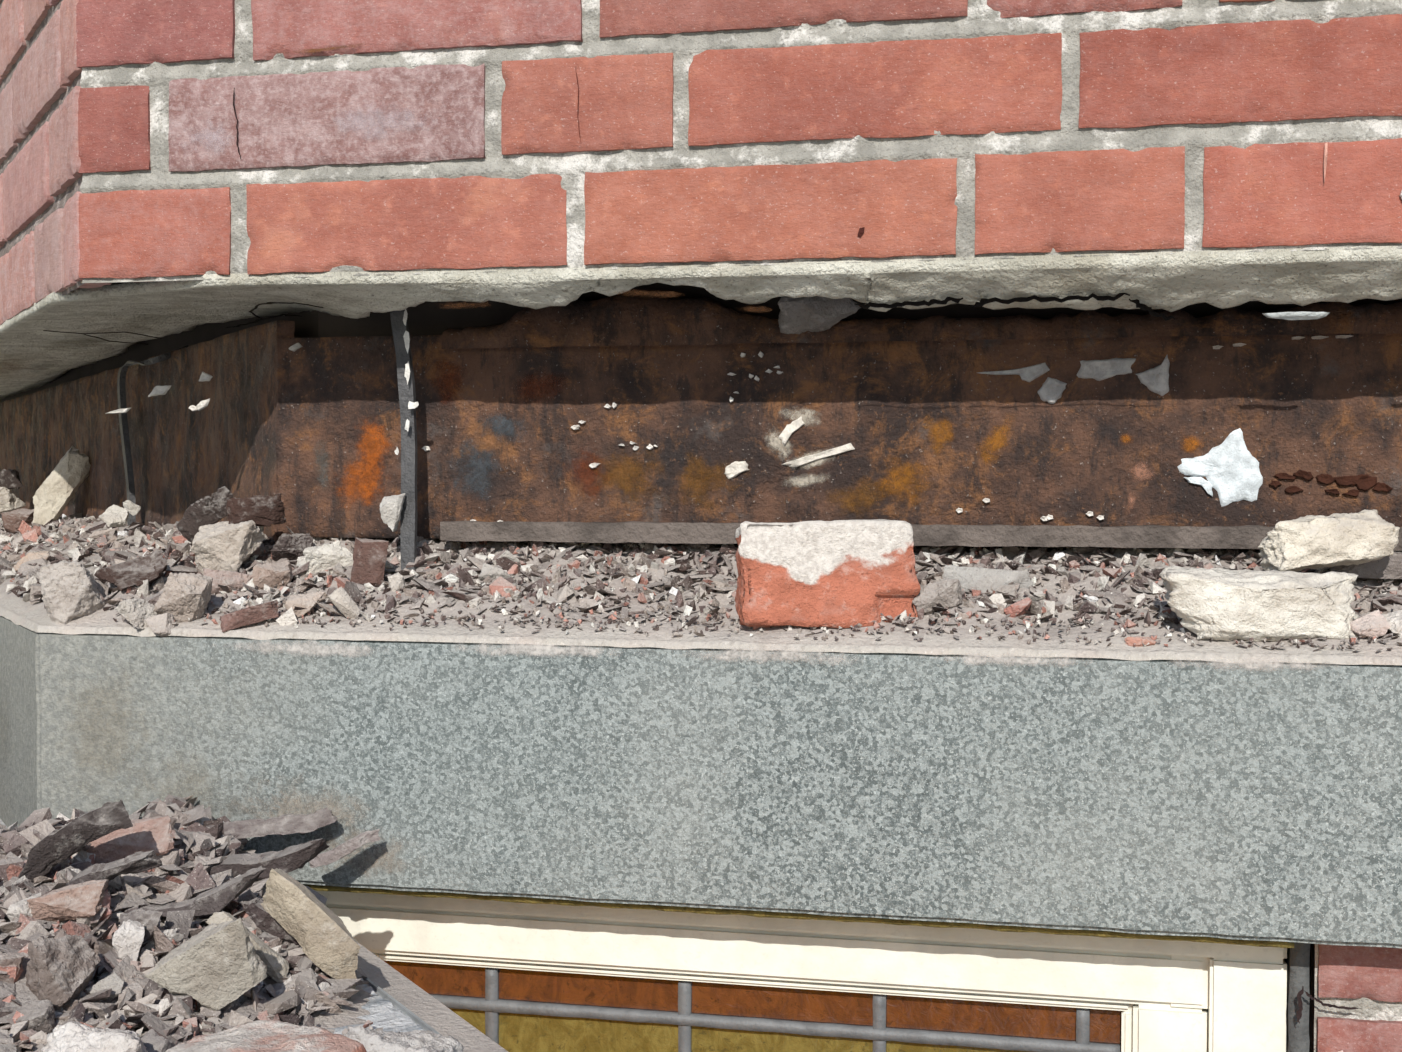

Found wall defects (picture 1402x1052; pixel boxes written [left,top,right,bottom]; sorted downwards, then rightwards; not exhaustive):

crack [43,330,162,344]
crack [226,302,323,328]
peeling [1262,312,1329,320]
peeling [978,355,1170,404]
rust [347,426,387,503]
rust [1131,464,1150,480]
peeling [1178,428,1393,507]
rust [175,486,233,543]
rust [94,548,167,592]
rust [1330,552,1402,580]